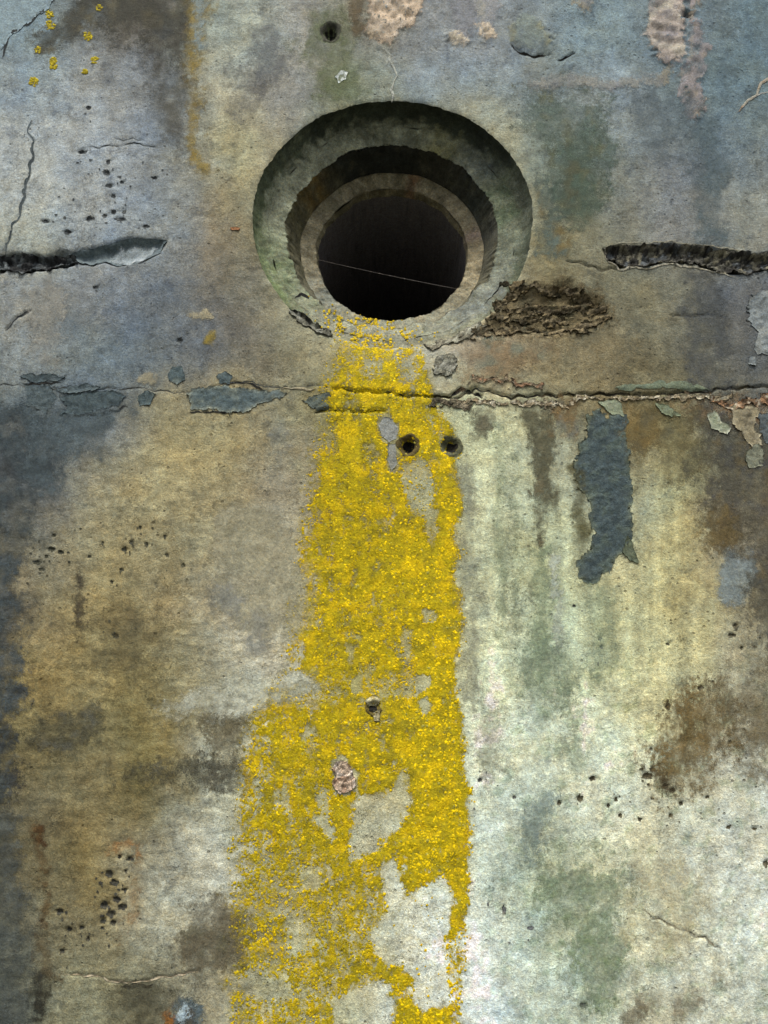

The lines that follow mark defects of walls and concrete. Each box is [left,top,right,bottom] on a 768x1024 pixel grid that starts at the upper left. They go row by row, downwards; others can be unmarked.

crack [5,119,35,255]
spalling [0,224,167,275]
spalling [602,242,768,275]
spalling [423,269,619,377]
crack [0,381,66,390]
peeling [20,373,155,416]
crack [61,381,321,417]
crack [428,374,768,411]
peeling [707,404,768,468]
leakage [0,400,120,964]
leakage [708,675,768,784]
leakage [0,970,55,1024]